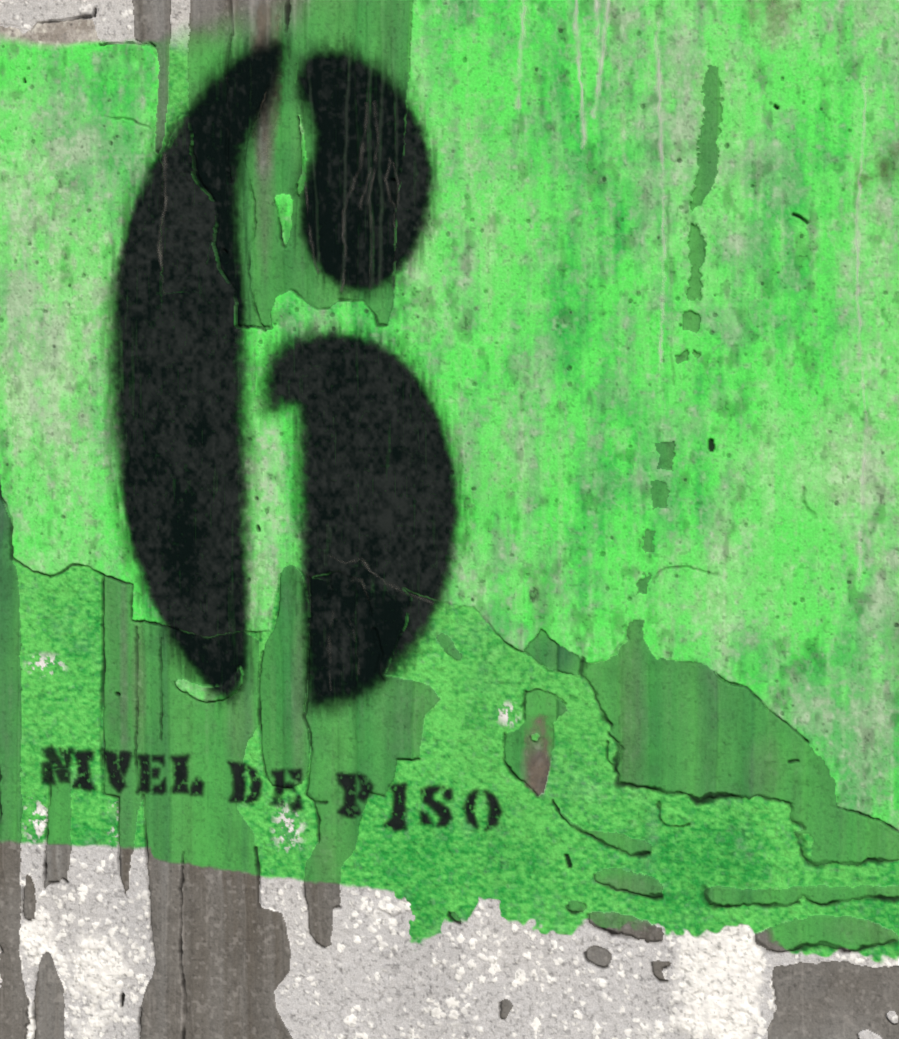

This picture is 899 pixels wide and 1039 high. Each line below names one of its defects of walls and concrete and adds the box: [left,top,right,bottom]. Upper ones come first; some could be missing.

peeling [99,0,171,157]
peeling [186,0,413,332]
peeling [0,484,72,1039]
peeling [99,565,440,1039]
peeling [502,688,663,901]
peeling [524,619,899,871]
peeling [565,900,664,969]
peeling [650,960,672,984]
peeling [699,885,899,1039]